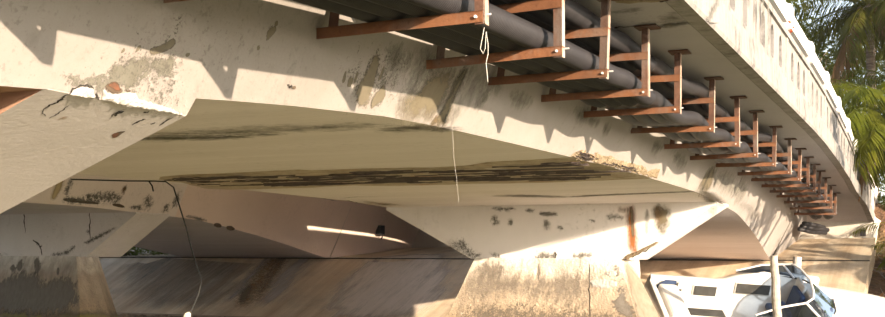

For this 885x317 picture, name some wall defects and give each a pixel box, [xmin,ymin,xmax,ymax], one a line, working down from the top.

peeling [65,13,196,124]
crack [42,94,68,119]
crack [111,109,173,126]
water stain [391,68,485,131]
water stain [143,129,260,140]
spalling [159,150,660,190]
water stain [52,180,73,199]
water stain [87,191,121,203]
water stain [491,195,548,226]
water stain [525,208,563,231]
corrosion [620,207,636,252]
corrosion [646,206,670,233]